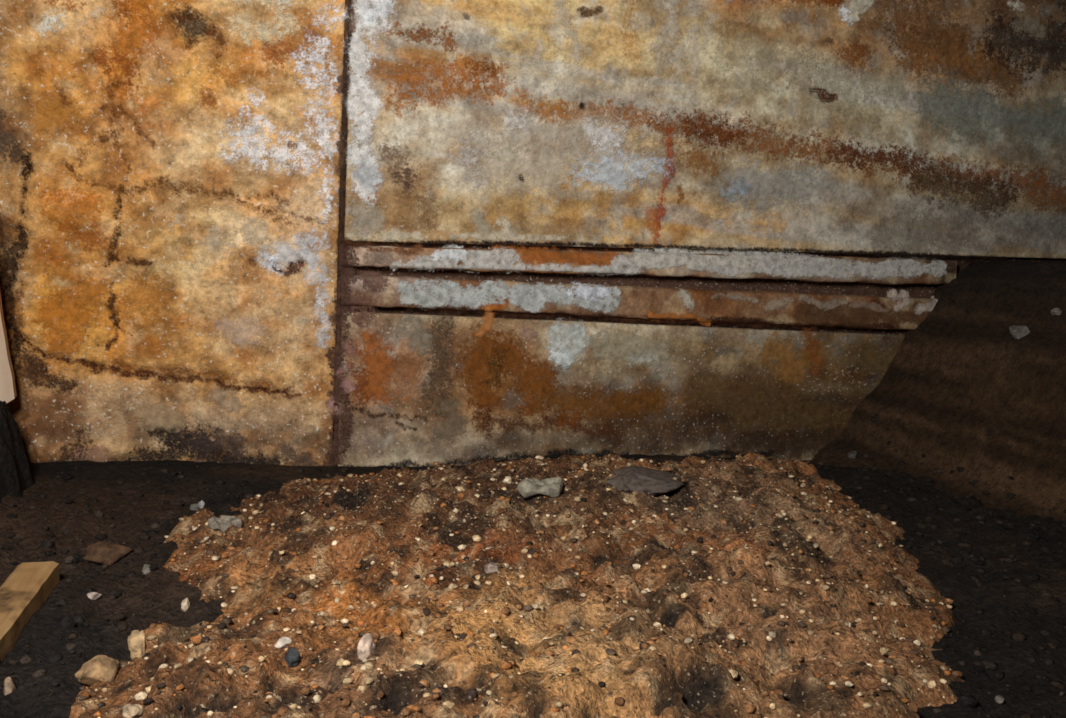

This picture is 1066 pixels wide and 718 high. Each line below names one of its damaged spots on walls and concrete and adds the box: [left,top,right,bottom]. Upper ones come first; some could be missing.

corrosion [92,0,159,107]
corrosion [210,27,317,86]
corrosion [874,0,1066,97]
peeling [1007,0,1046,38]
corrosion [42,187,111,250]
crack [0,81,323,399]
efflorescence [201,0,346,350]
peeling [335,0,947,354]
corrosion [375,21,1066,245]
corrosion [347,331,421,405]
peeling [519,321,670,386]
corrosion [407,293,929,443]